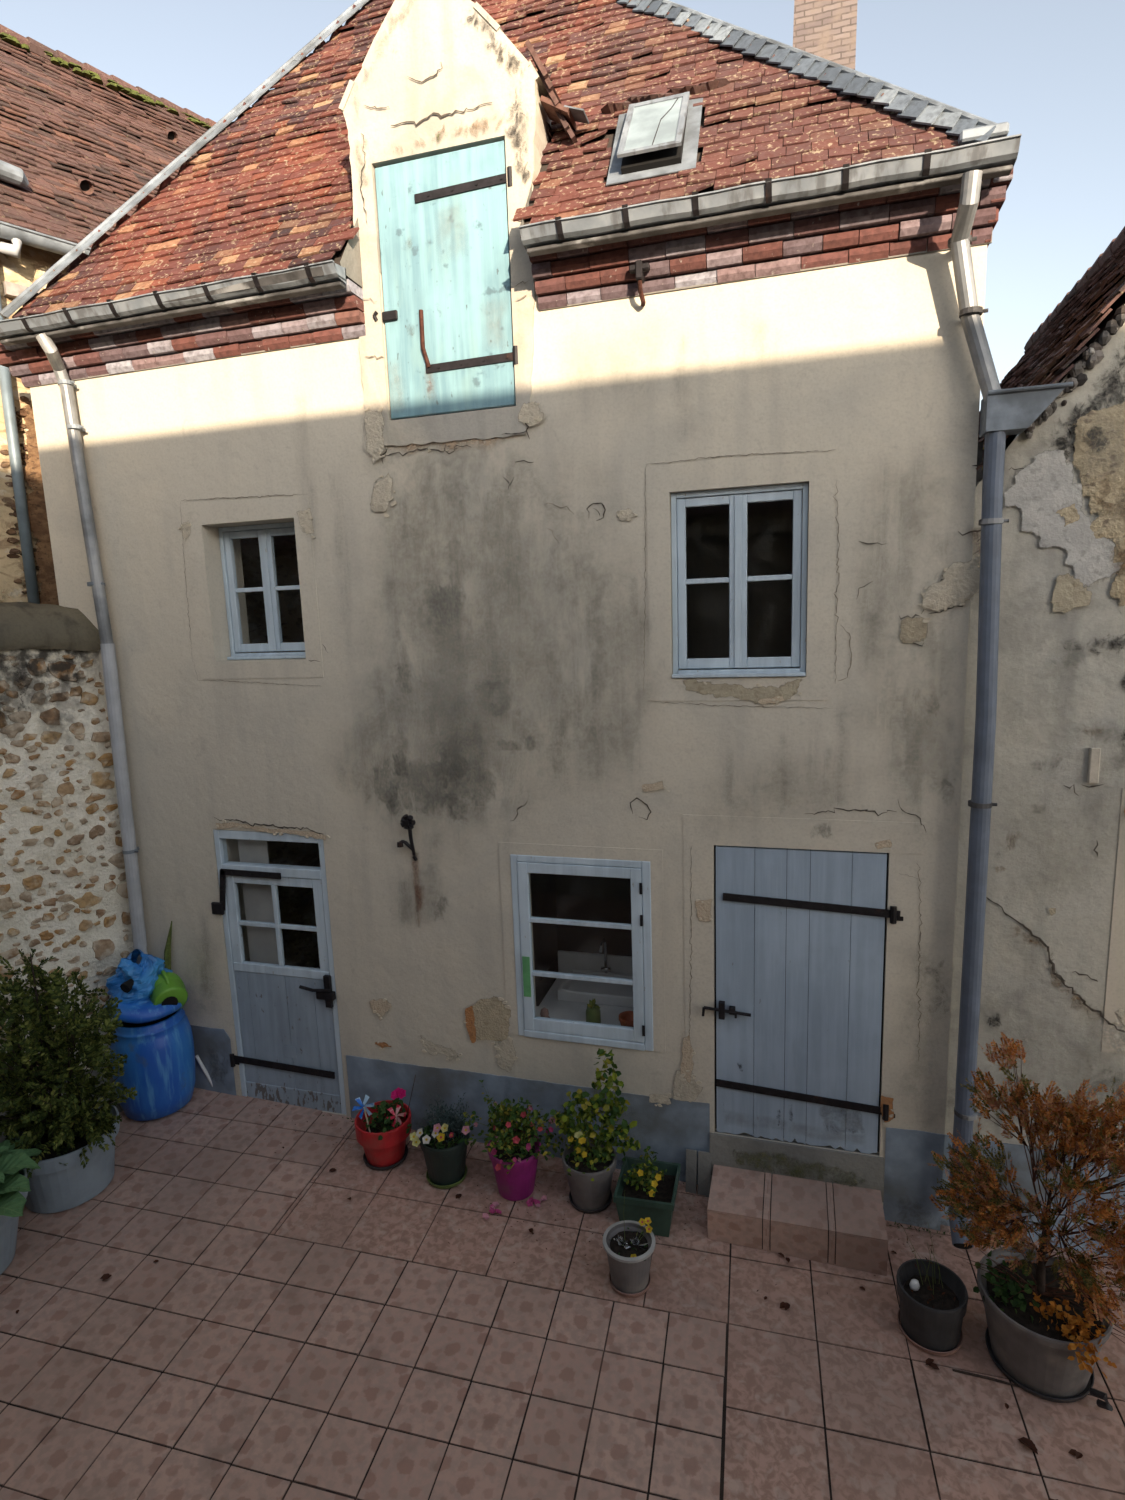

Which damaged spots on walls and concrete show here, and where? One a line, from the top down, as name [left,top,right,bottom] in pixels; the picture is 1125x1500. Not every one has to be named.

flaking render [364,407,385,464]
flaking render [1003,402,1125,613]
flaking render [683,679,802,707]
flaking render [214,817,330,840]
crack [987,898,1125,1033]
flaking render [463,996,512,1045]
flaking render [649,1036,702,1107]